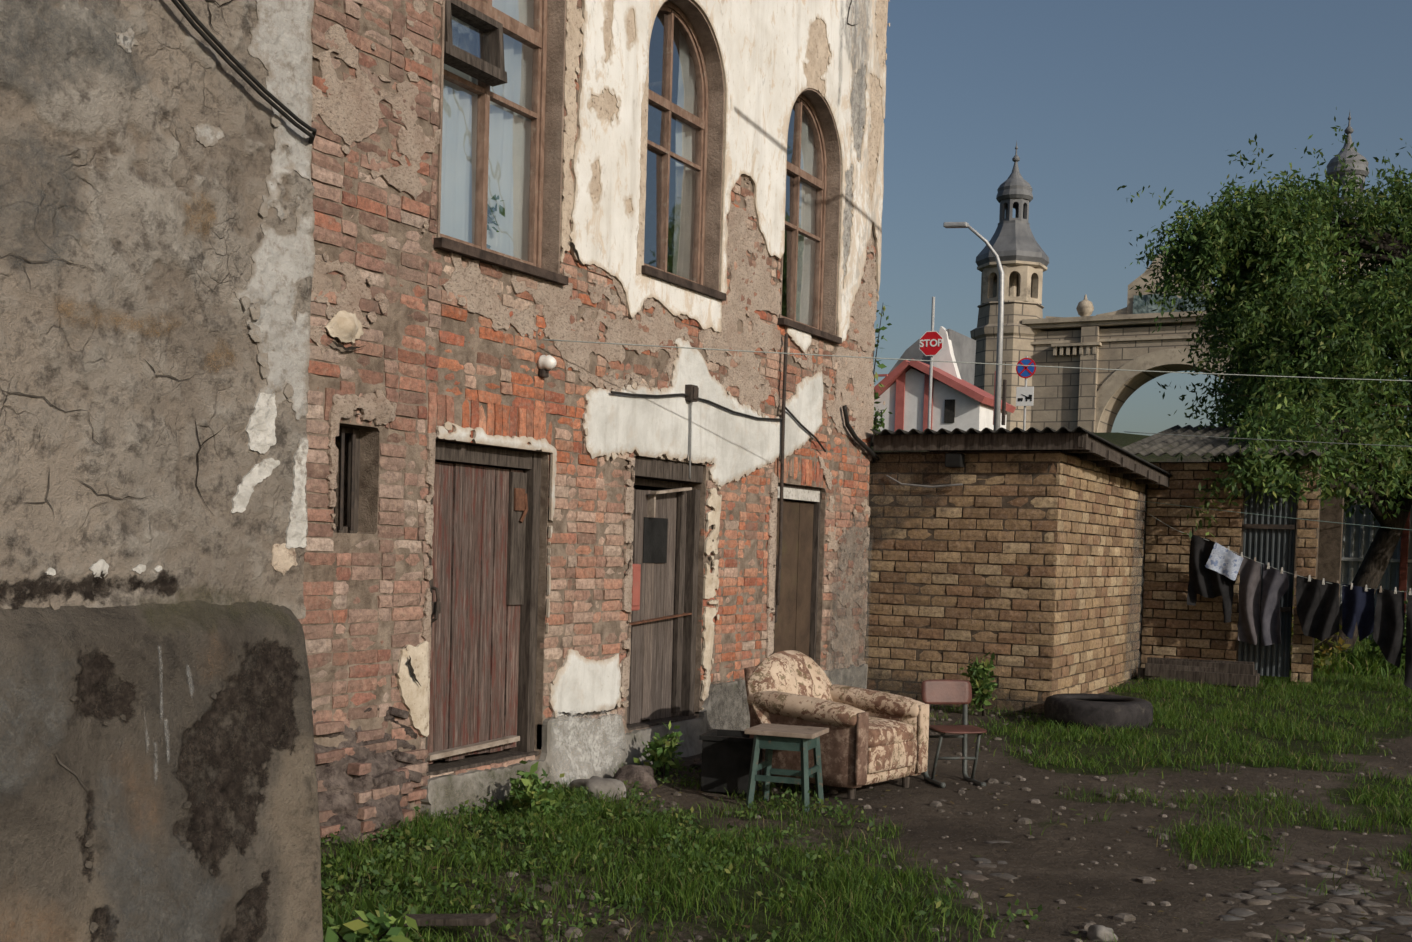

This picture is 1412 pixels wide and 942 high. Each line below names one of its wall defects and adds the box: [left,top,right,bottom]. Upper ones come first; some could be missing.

peeling [191,123,224,147]
peeling [231,0,444,576]
peeling [396,421,557,737]
spalling [441,0,890,786]